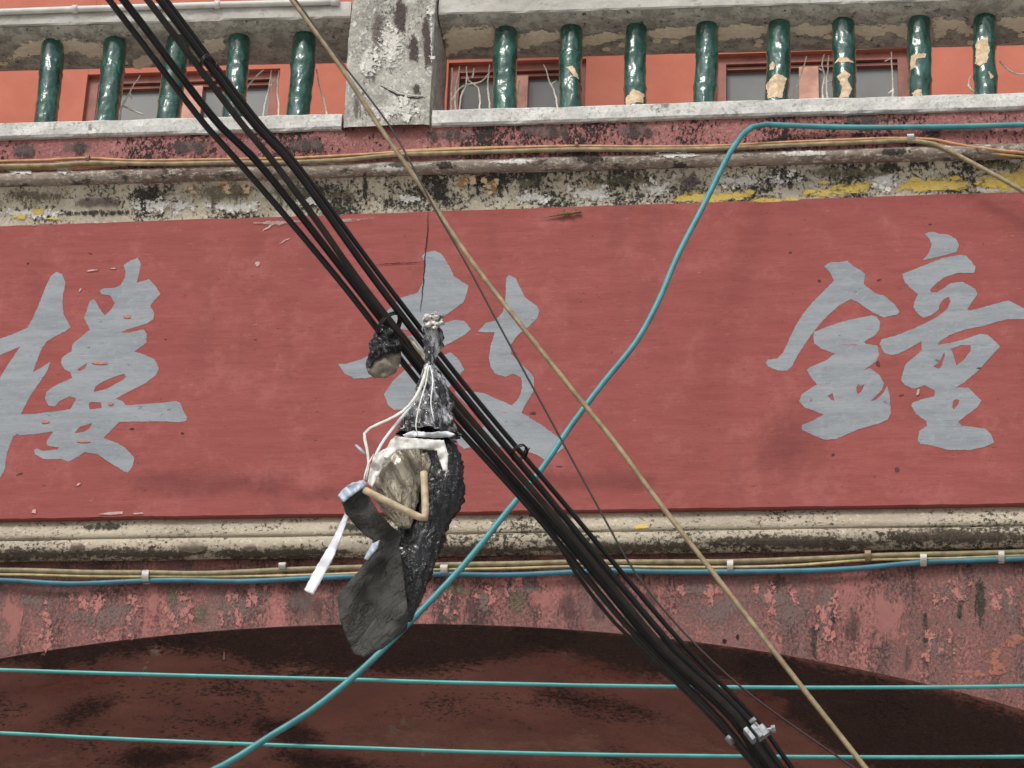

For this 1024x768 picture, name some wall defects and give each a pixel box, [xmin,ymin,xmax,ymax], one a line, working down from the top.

flaking render [718,23,768,47]
peeling [766,62,787,99]
peeling [834,57,854,98]
peeling [910,53,926,71]
flaking render [932,16,994,79]
peeling [625,89,645,105]
leakage [468,159,540,198]
leakage [764,147,911,189]
leakage [4,185,167,217]
leakage [0,545,364,562]
leakage [439,542,574,558]
leakage [590,524,1024,556]